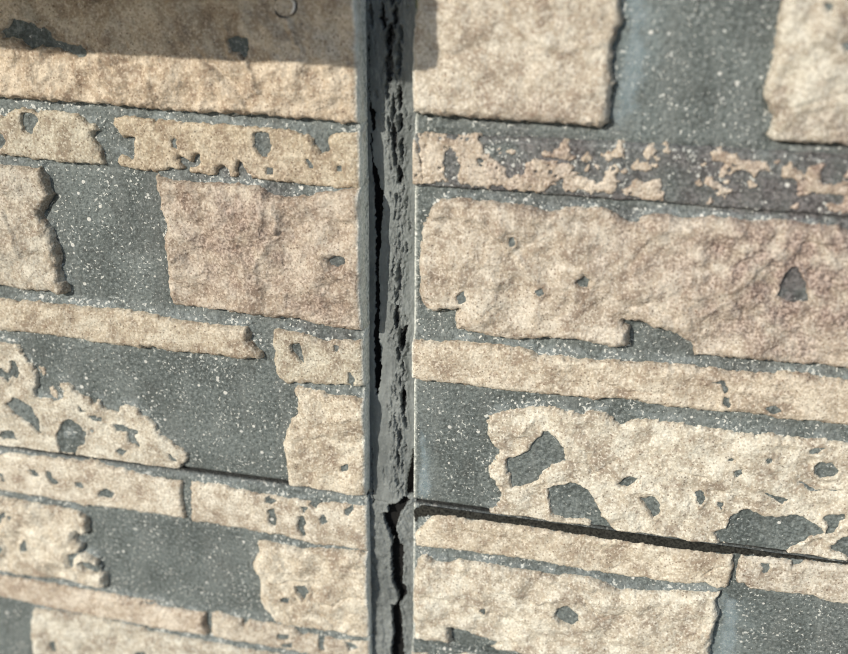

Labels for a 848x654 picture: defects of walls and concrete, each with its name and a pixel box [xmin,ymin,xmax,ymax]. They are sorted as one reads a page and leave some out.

peeling [412,131,848,217]
crack [368,4,407,394]
spalling [0,360,20,382]
spalling [7,398,41,433]
spalling [57,419,86,454]
spalling [507,431,566,487]
spalling [619,476,637,486]
spalling [809,448,839,478]
spalling [548,482,611,527]
spalling [641,496,660,517]
crack [371,448,414,654]
spalling [715,509,848,557]